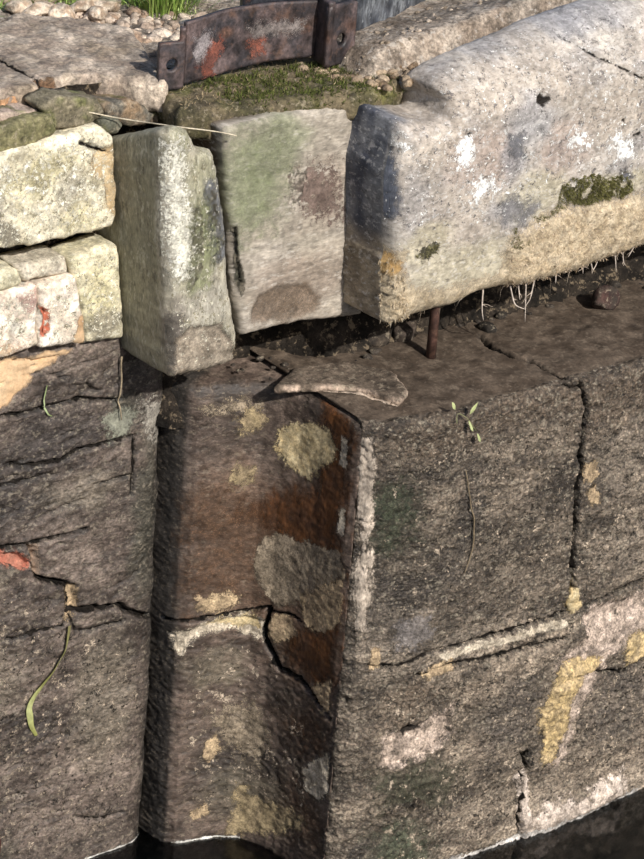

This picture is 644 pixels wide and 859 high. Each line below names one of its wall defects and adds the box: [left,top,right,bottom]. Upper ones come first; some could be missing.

rust [195,35,225,79]
crack [0,396,115,416]
crack [0,434,135,493]
crack [535,364,586,585]
crack [372,610,567,674]
crack [515,749,528,831]
leakage [378,823,426,859]